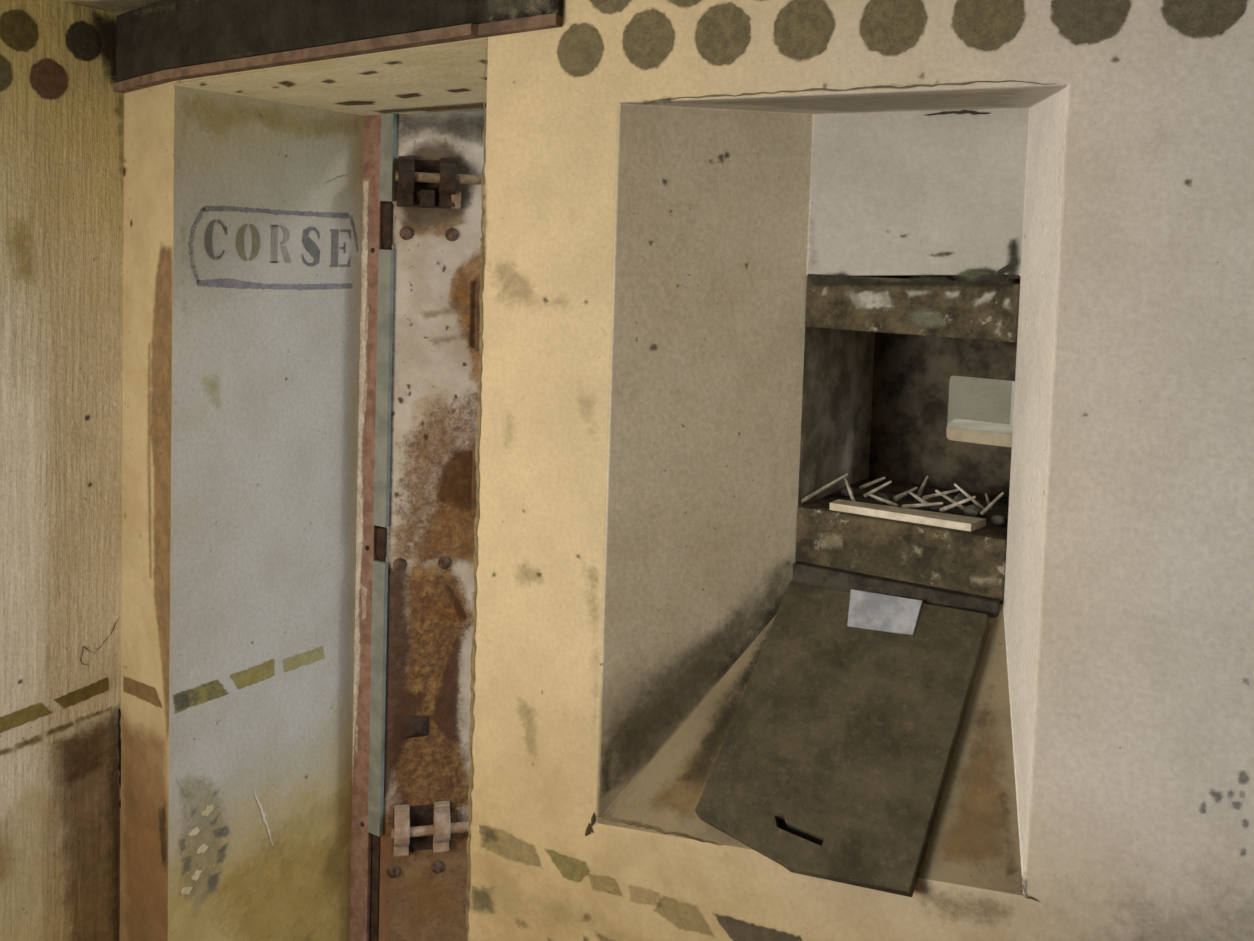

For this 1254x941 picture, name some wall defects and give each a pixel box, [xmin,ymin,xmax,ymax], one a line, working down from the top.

rust [383,256,481,941]
leakage [602,589,779,790]